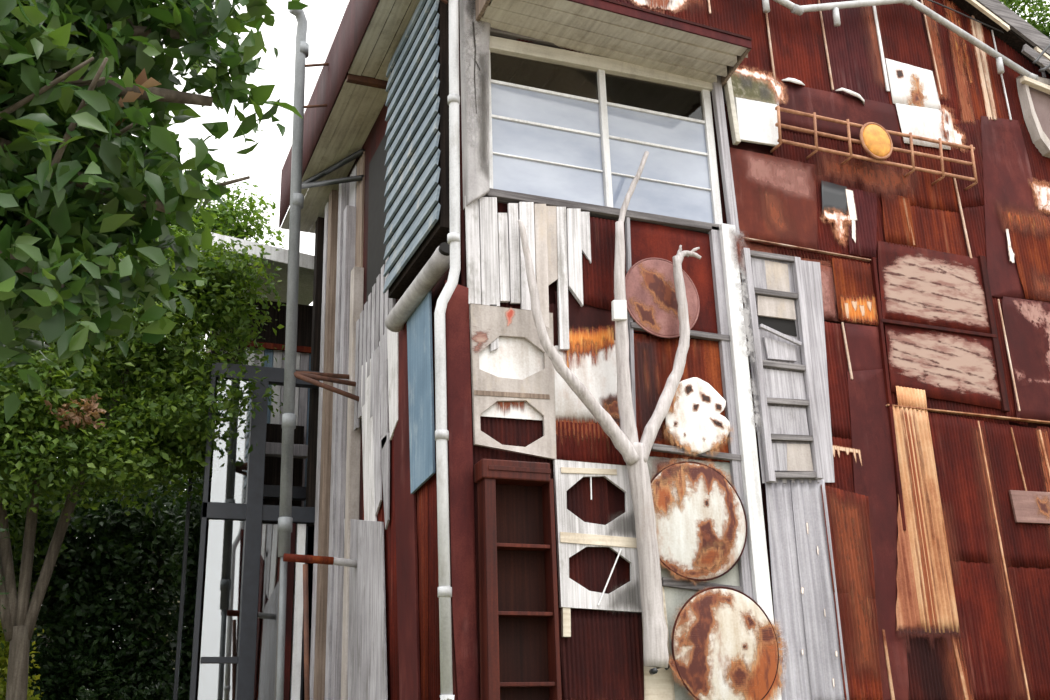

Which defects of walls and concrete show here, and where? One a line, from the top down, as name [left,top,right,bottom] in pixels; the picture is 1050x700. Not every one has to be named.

peeling [634,0,687,11]
peeling [824,189,857,243]
peeling [1031,182,1050,213]
rust [840,295,878,324]
peeling [883,253,990,327]
rust [564,327,615,368]
peeling [887,331,1001,400]
rust [630,264,738,579]
rust [828,491,878,678]
rust [898,412,974,700]
rust [669,589,733,700]
rust [726,613,786,700]